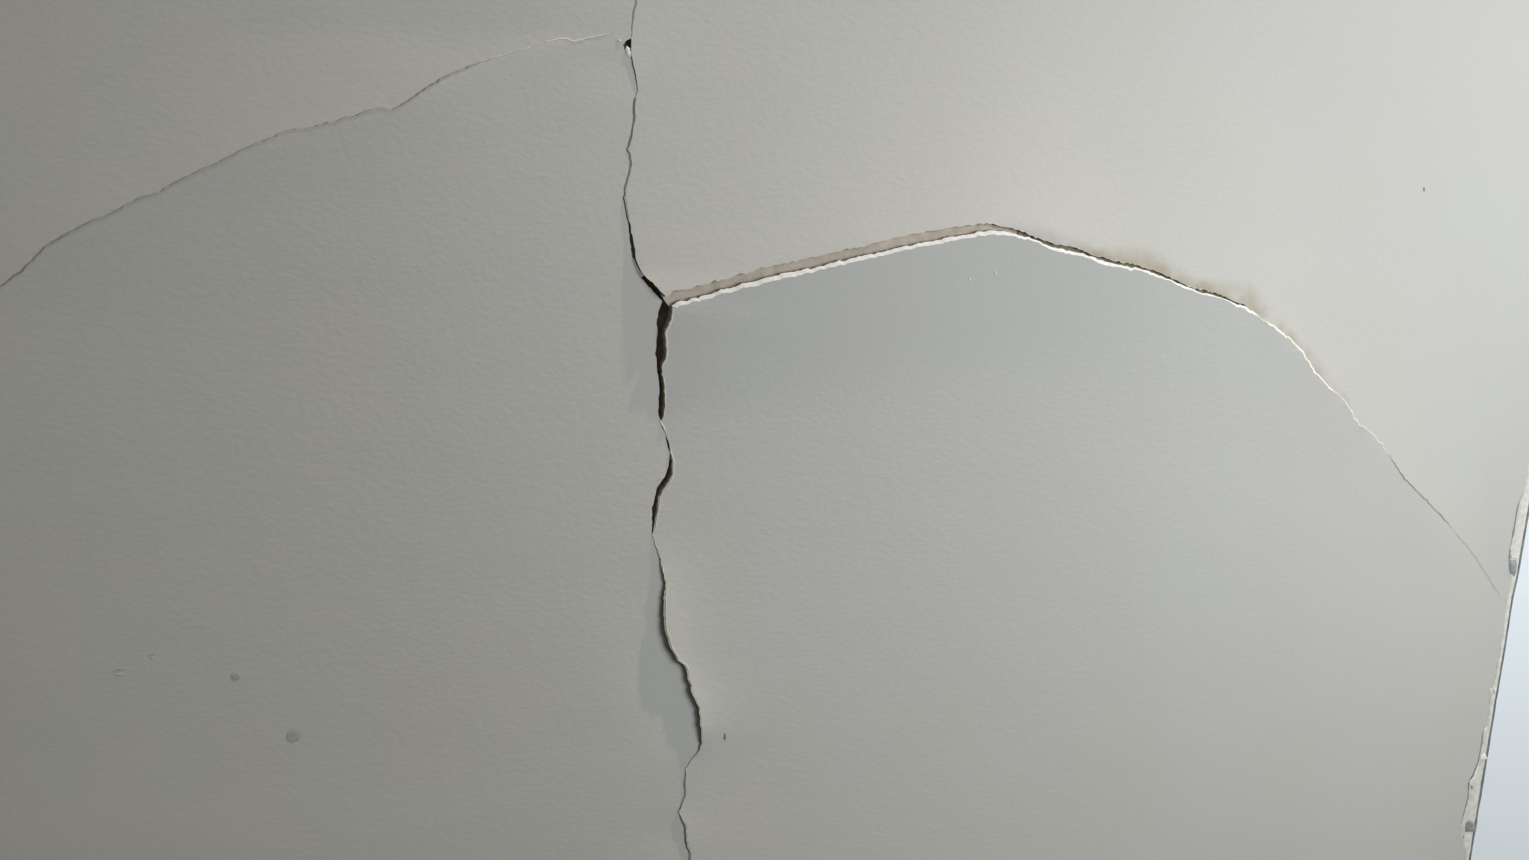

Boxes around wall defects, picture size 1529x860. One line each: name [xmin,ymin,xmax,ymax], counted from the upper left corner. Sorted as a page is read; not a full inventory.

crack [0,0,637,287]
crack [641,223,1244,860]
crack [1360,426,1529,860]
flaking render [1460,459,1529,860]